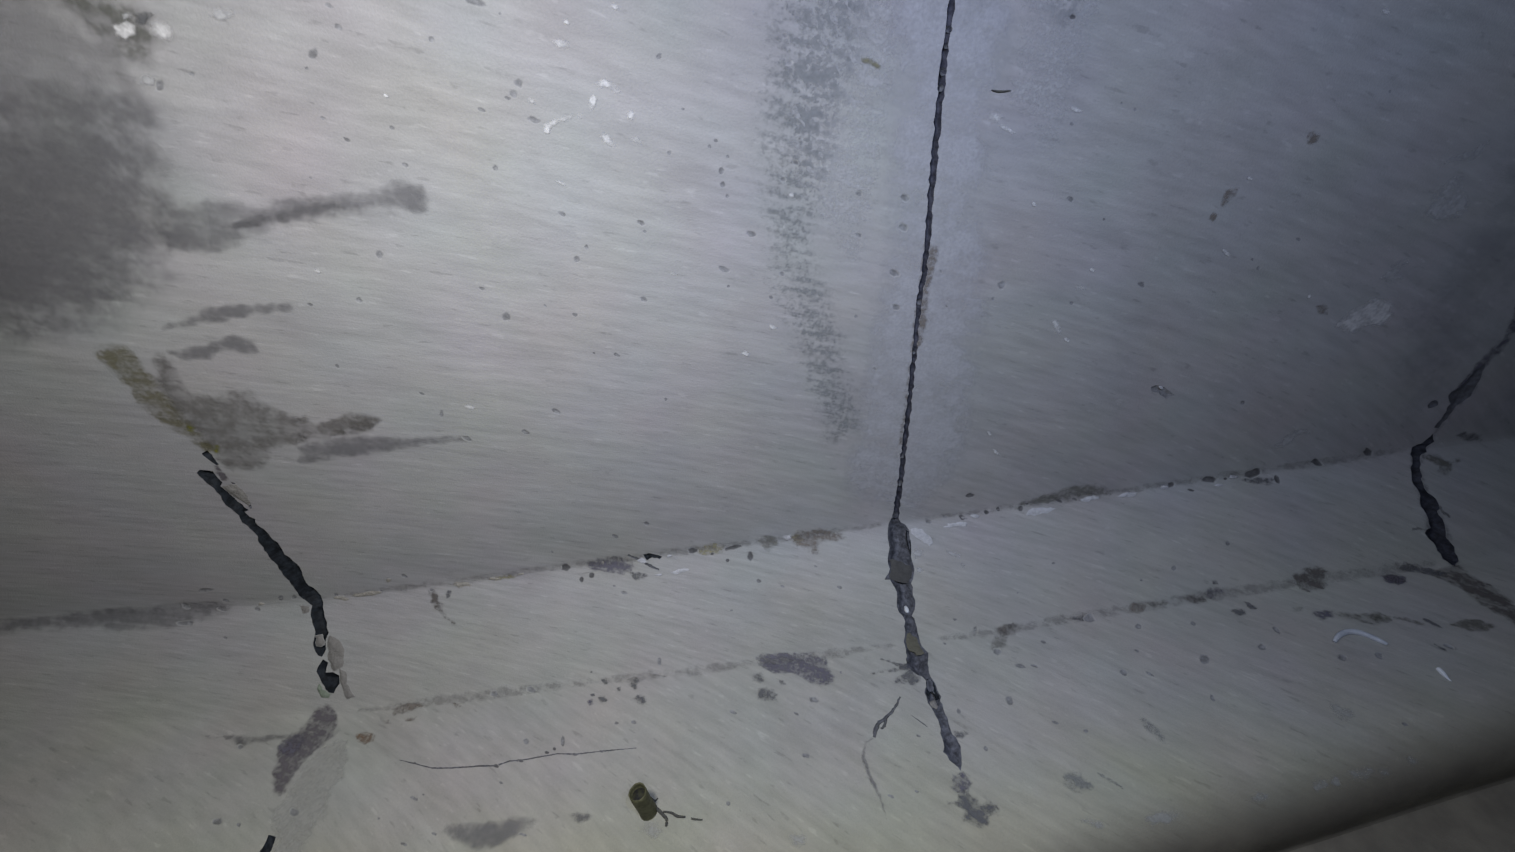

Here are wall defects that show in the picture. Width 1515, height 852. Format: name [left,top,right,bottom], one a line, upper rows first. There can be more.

damp [75,0,150,40]
damp [857,0,1007,504]
damp [160,361,388,466]
crack [873,0,1324,824]
crack [1362,447,1373,457]
crack [1410,308,1515,621]
crack [560,530,840,583]
crack [176,451,524,792]
crack [400,747,636,769]
crack [260,835,276,852]